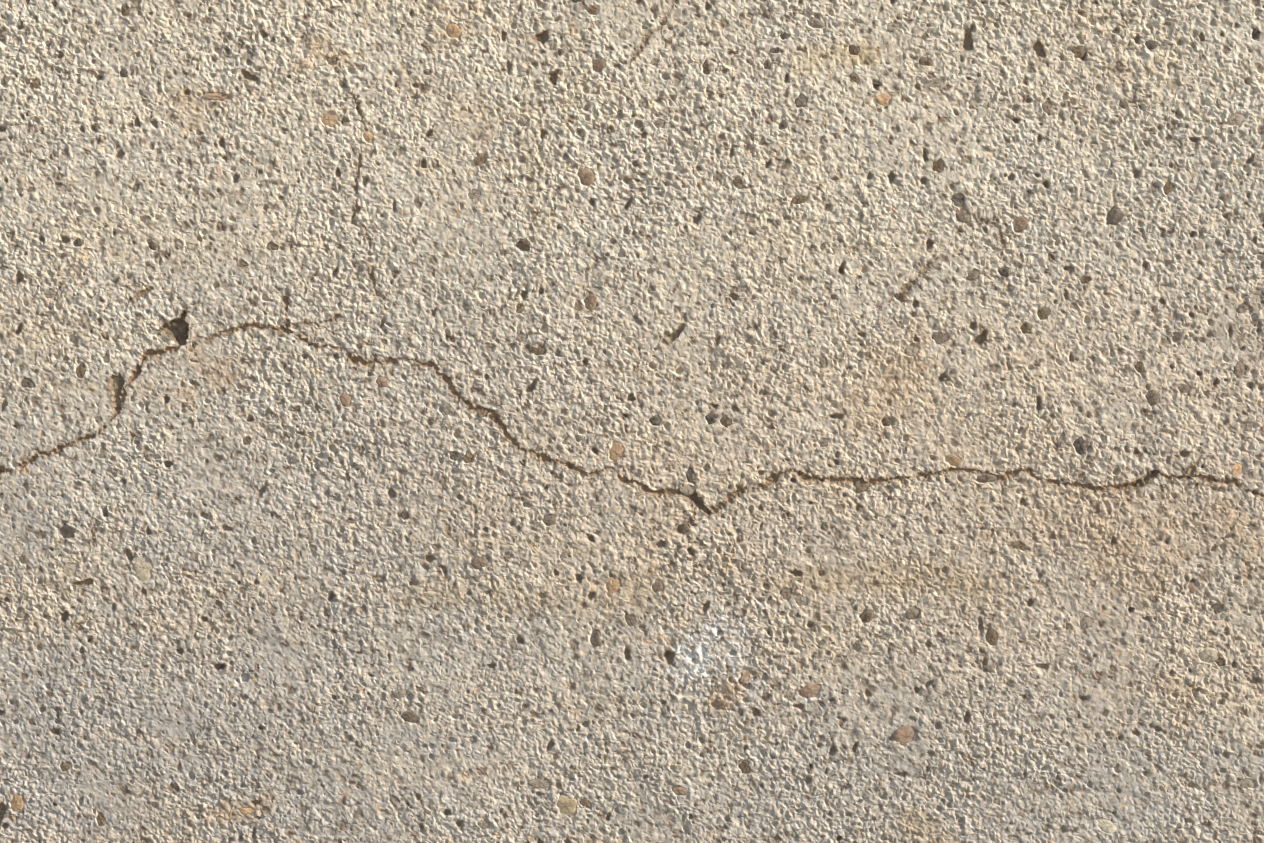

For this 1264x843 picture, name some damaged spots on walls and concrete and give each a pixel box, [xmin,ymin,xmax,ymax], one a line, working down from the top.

crack [129,287,153,301]
crack [0,296,1264,527]